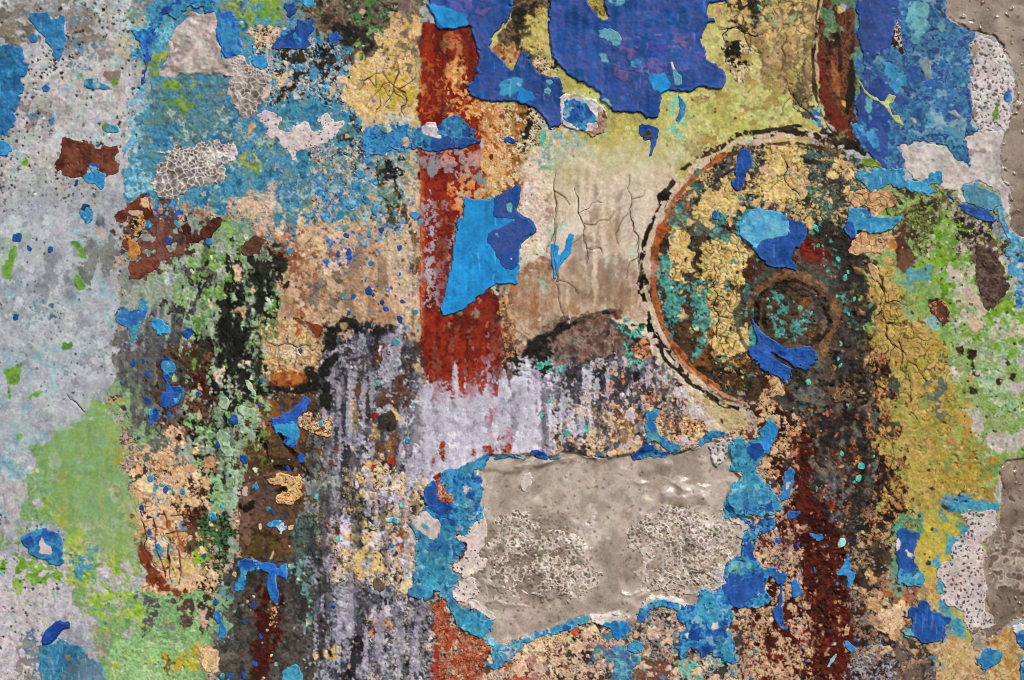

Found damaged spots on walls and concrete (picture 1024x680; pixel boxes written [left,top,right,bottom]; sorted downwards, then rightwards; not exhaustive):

peeling [844,0,1024,311]
crack [546,174,645,317]
leakage [526,318,585,358]
crack [705,264,736,339]
leakage [419,380,542,473]
leakage [313,473,331,568]
leakage [344,451,372,561]
spalling [384,409,802,680]
rust [781,434,854,680]
leakage [352,611,363,672]